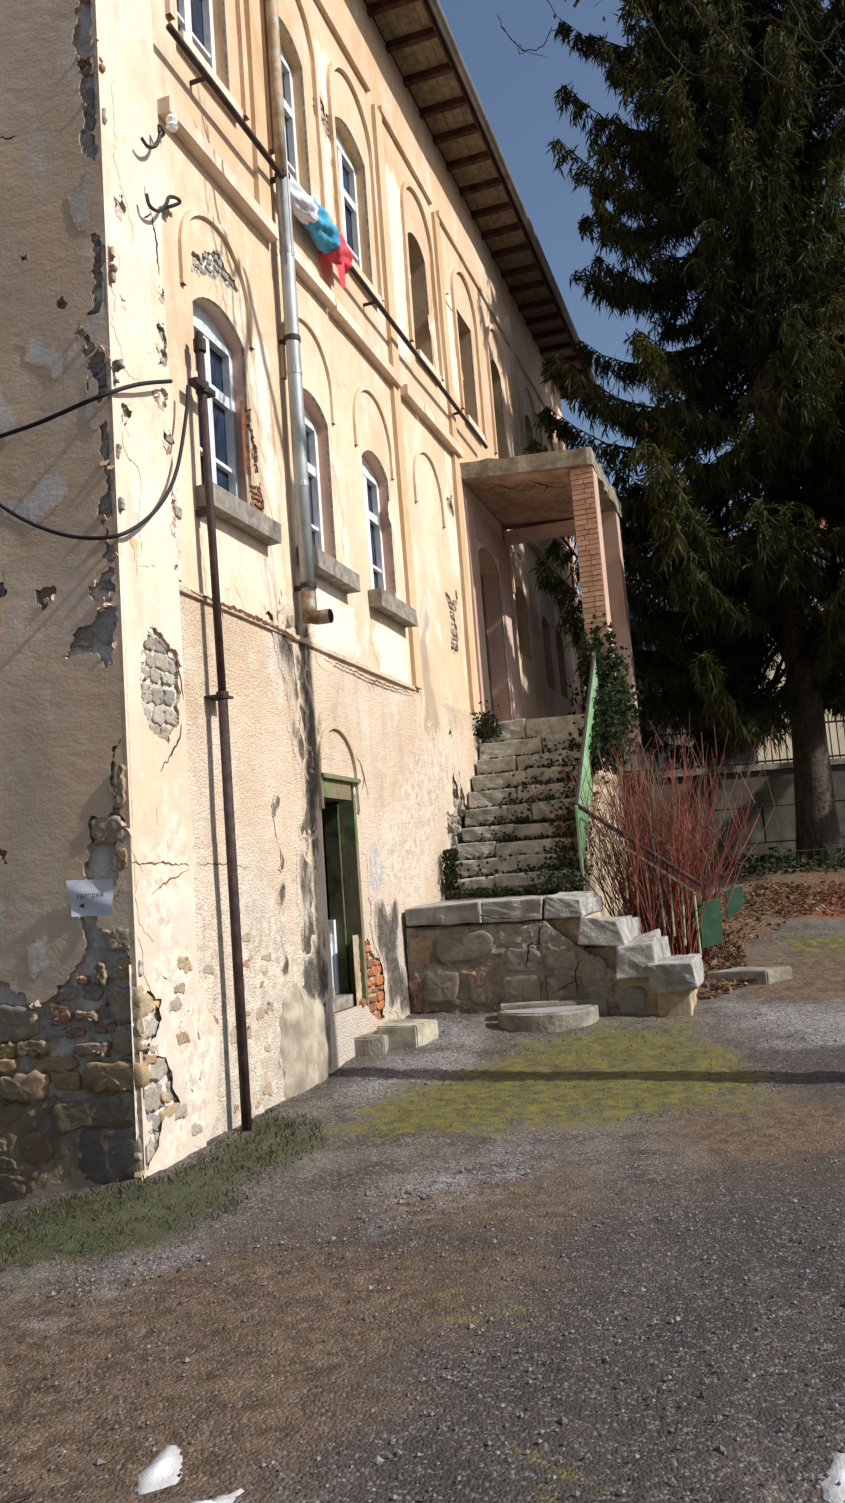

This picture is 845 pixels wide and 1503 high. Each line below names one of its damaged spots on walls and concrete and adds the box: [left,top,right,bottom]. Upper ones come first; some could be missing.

peeling [308,33,336,225]
peeling [20,0,183,668]
flaking render [191,249,234,289]
peeling [240,327,282,521]
peeling [0,469,71,529]
flaking render [140,628,183,741]
peeling [201,516,286,629]
peeling [307,576,414,696]
peeling [388,466,401,600]
leakage [272,602,337,1074]
flaking render [0,747,304,1203]
flaking render [353,935,390,1020]